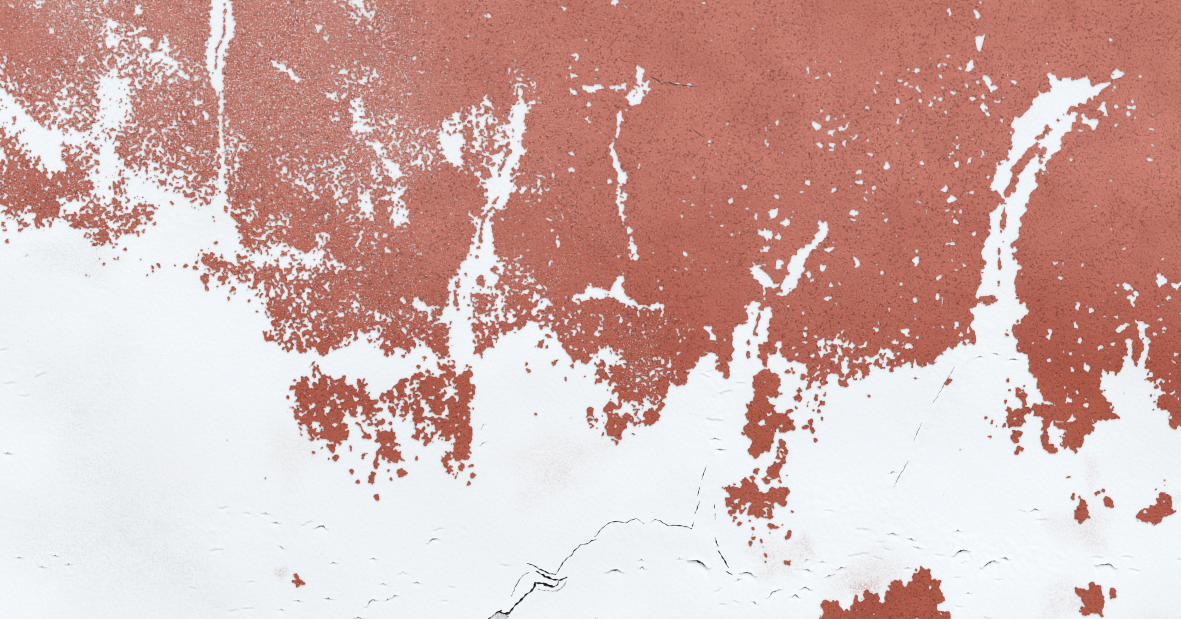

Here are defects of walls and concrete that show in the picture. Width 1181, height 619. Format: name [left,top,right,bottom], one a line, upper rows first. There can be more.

peeling [897,34,1005,129]
peeling [566,39,662,261]
peeling [812,96,879,156]
peeling [948,136,988,178]
peeling [752,228,781,253]
peeling [768,208,800,228]
peeling [822,161,974,314]
peeling [1114,282,1139,307]
peeling [1156,270,1181,307]
peeling [1063,322,1090,372]
crack [488,368,733,619]